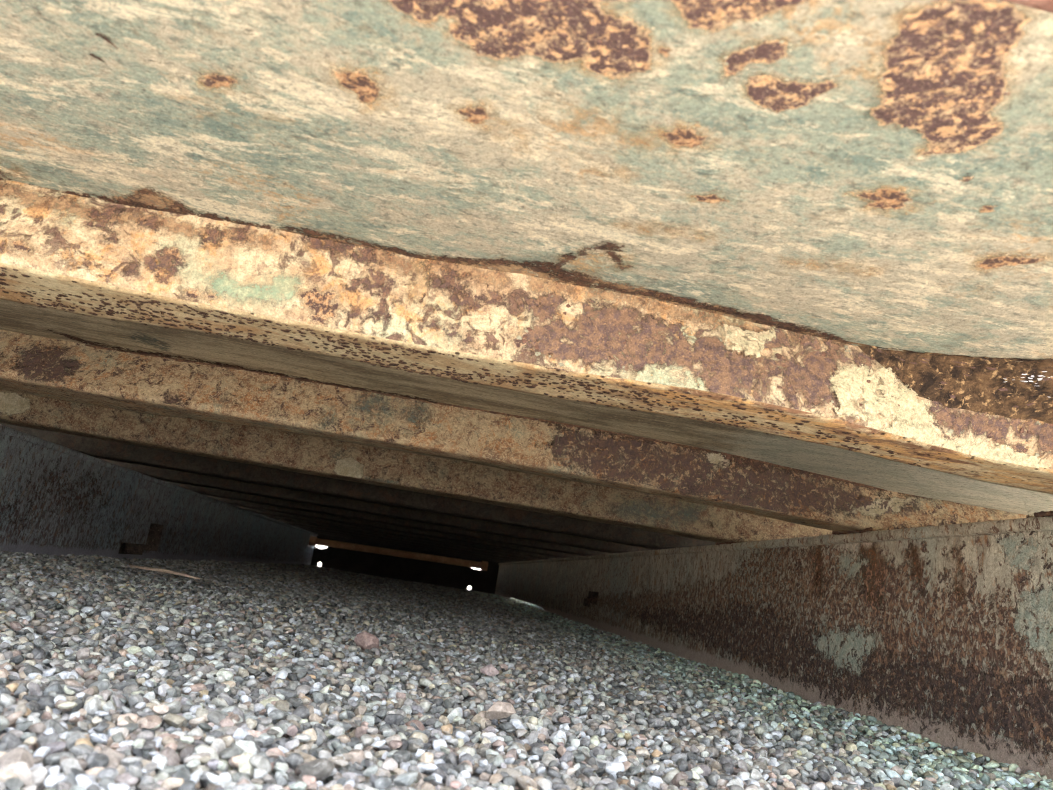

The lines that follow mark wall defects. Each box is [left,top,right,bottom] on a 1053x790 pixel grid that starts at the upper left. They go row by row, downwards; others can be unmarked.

rust [332,68,386,110]
rust [388,0,672,79]
rust [671,0,804,33]
rust [719,39,837,113]
rust [869,0,1033,157]
rust [651,125,707,148]
rust [0,181,274,251]
crack [0,171,851,345]
rust [973,253,1051,271]
rust [0,237,949,467]
rust [924,399,1053,457]
rust [534,427,1053,767]